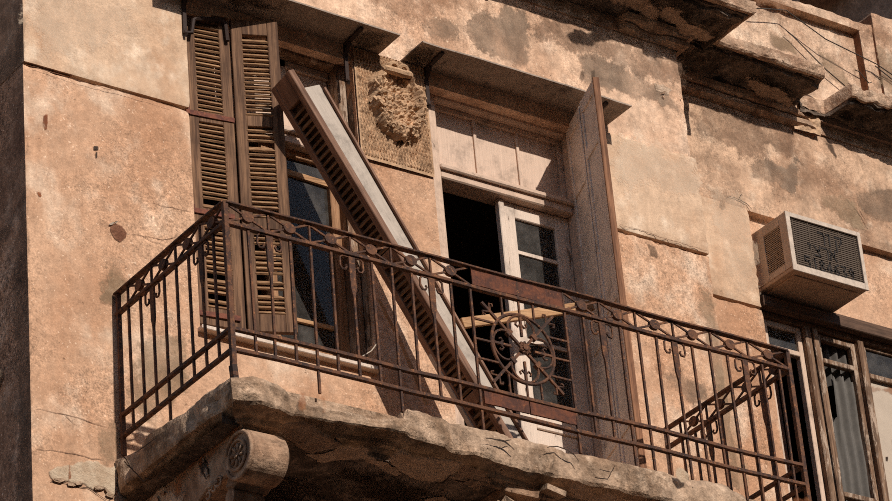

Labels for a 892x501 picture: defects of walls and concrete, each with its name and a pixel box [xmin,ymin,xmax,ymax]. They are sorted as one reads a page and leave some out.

water stain [446,6,531,60]
spalling [611,0,714,41]
water stain [765,157,798,193]
spalling [278,422,461,483]
spalling [49,460,118,501]